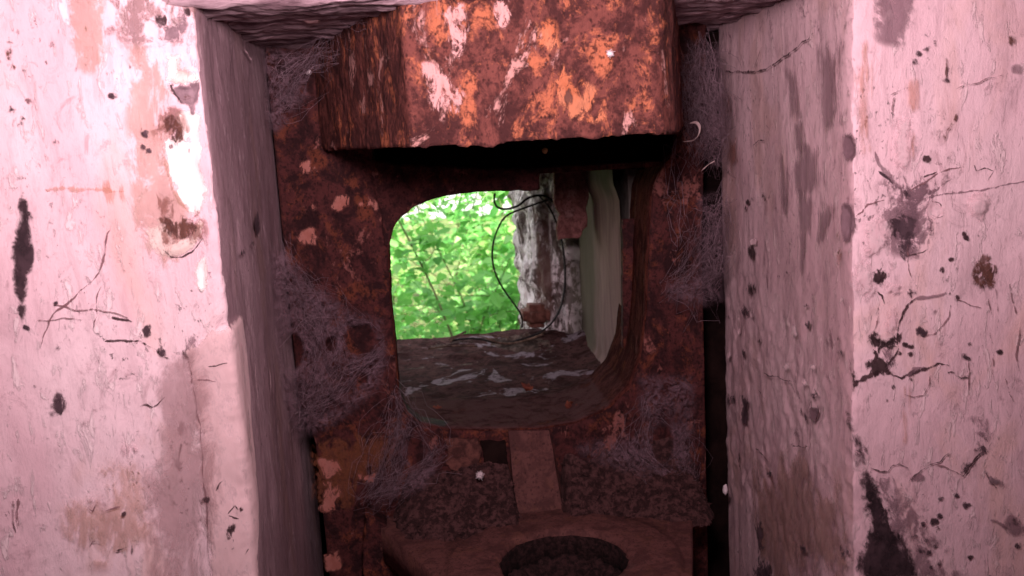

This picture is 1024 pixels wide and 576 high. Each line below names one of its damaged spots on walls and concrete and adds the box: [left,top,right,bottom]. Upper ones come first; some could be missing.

corrosion [537,19,559,51]
corrosion [552,66,606,123]
crack [726,33,813,73]
damp [12,199,34,330]
crack [39,230,168,359]
spalling [146,55,208,292]
corrosion [553,171,589,240]
crack [852,284,1020,402]
damp [846,413,956,576]